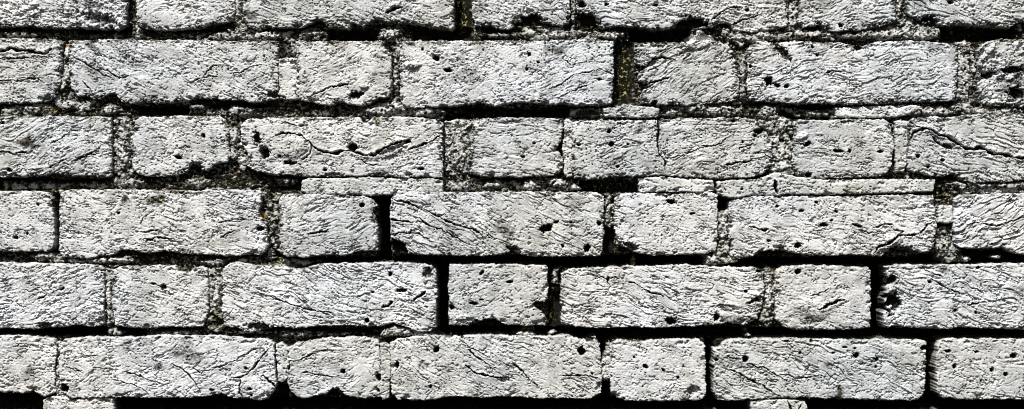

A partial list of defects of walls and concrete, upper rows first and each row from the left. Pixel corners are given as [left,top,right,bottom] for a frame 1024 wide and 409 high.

crack [656,121,778,194]